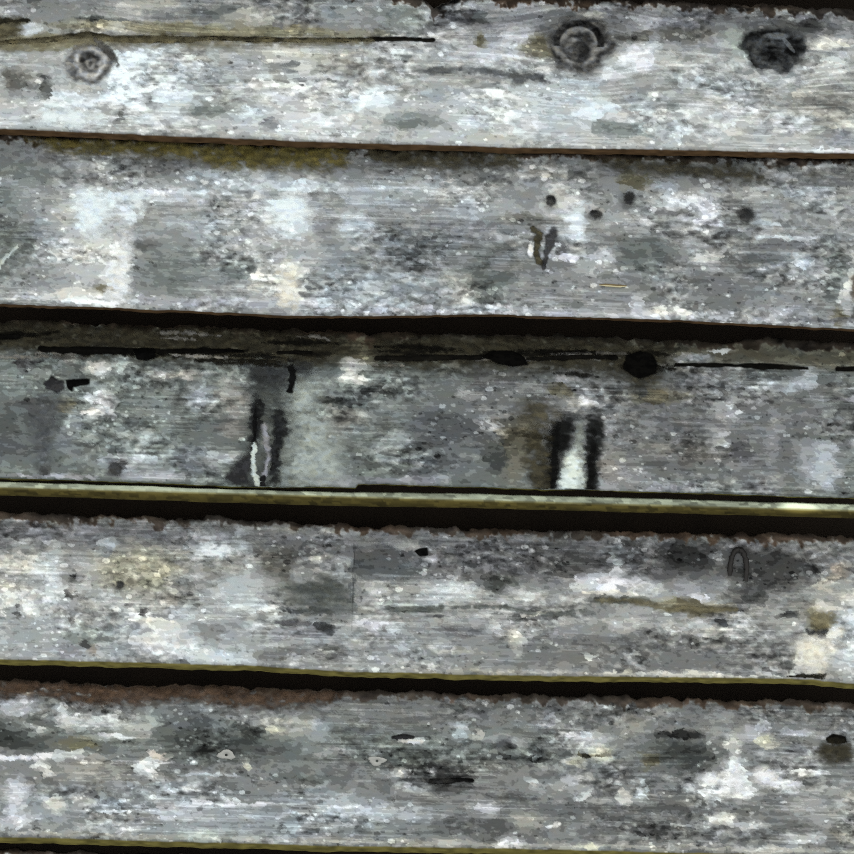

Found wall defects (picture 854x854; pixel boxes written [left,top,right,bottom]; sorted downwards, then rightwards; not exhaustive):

crack [0,32,435,67]
crack [0,334,313,364]
crack [374,353,494,361]
crack [526,354,618,362]
crack [675,362,808,370]
crack [836,364,854,372]
water stain [155,339,339,486]
water stain [519,403,605,490]